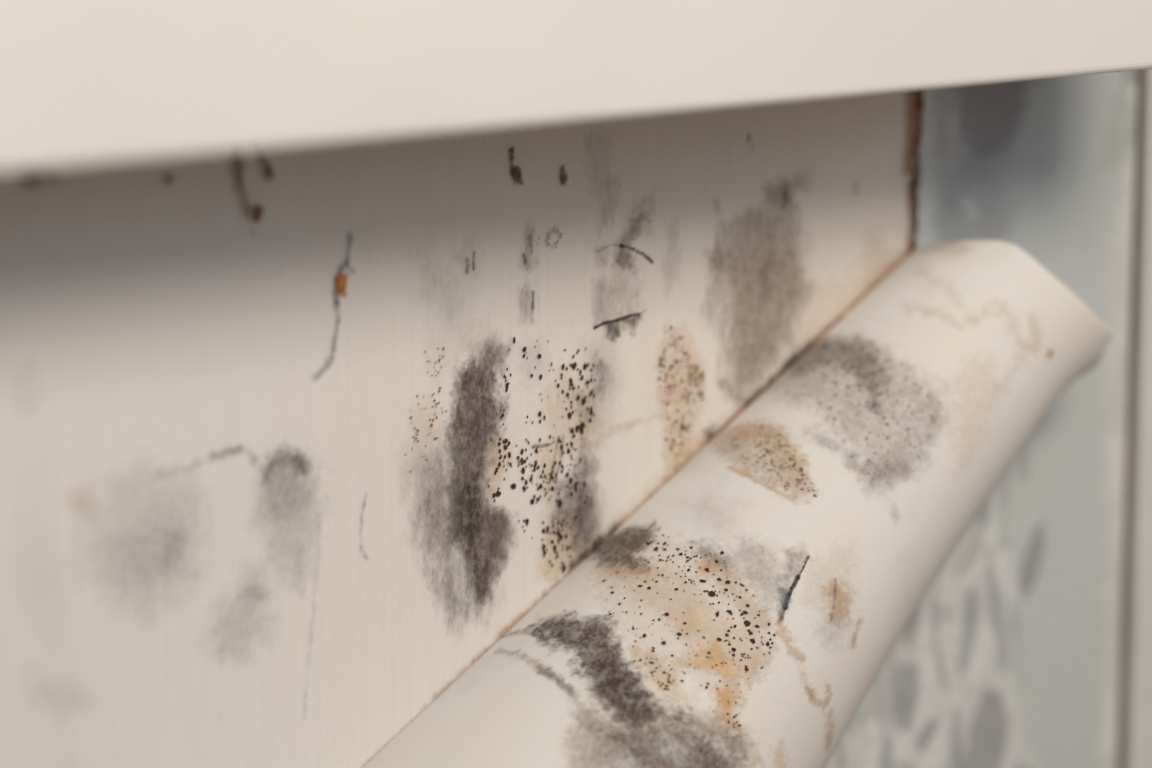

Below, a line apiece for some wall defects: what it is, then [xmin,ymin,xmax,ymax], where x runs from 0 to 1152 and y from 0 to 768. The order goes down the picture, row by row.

corrosion [253,205,264,222]
corrosion [335,274,347,296]
water stain [713,213,804,380]
water stain [708,424,817,497]
water stain [767,339,937,480]
water stain [405,325,786,768]